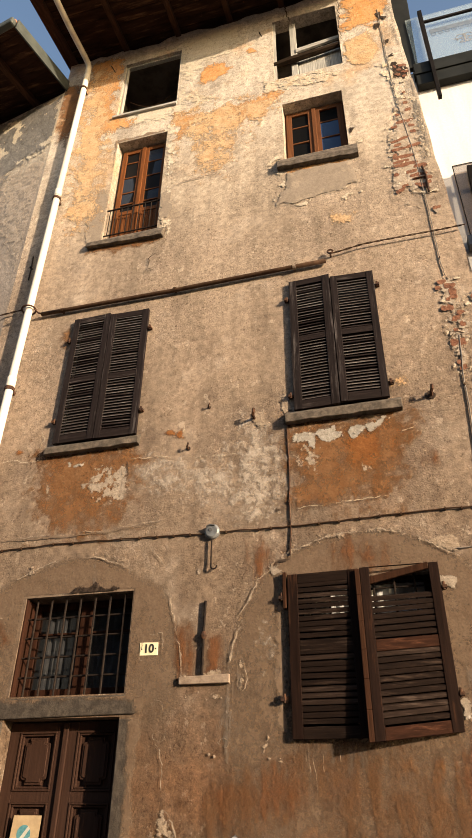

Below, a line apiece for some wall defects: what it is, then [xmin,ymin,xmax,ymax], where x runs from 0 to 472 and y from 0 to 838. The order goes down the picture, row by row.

peeling [0,96,62,188]
peeling [57,20,340,236]
flaking render [339,0,439,196]
flaking render [430,275,472,374]
peeling [81,461,129,506]
peeling [291,415,390,478]
crack [247,527,460,602]
crack [140,593,182,669]
peeling [155,810,176,838]